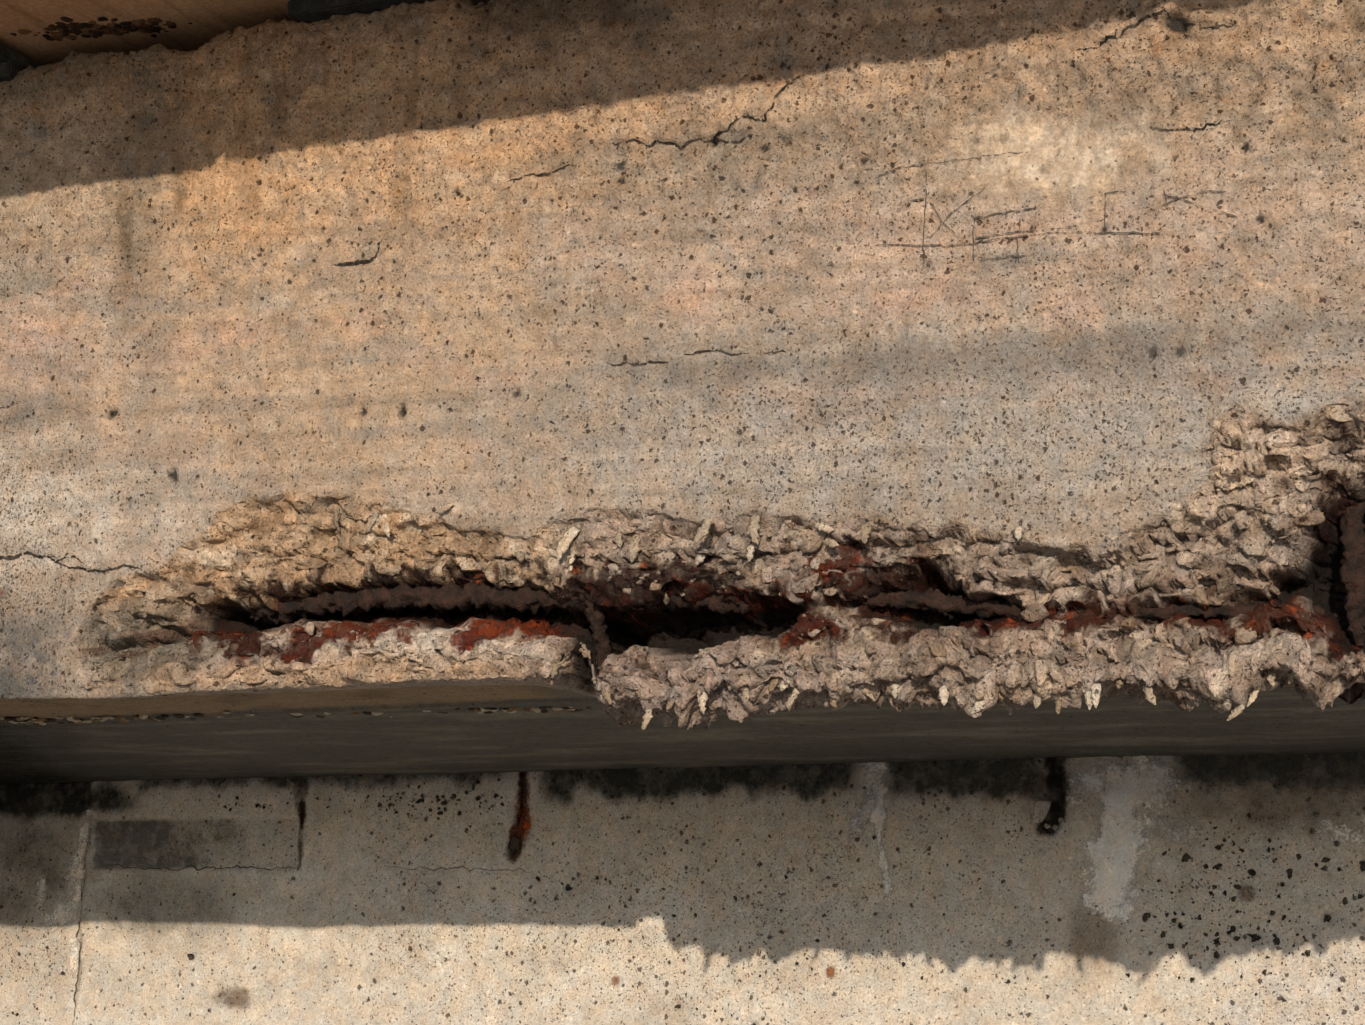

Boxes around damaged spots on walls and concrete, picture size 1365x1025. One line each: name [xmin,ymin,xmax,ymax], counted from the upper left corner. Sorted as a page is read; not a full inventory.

crack [1076,8,1232,50]
crack [612,76,800,150]
crack [507,164,570,182]
crack [334,240,382,266]
crack [606,349,785,367]
crack [0,551,149,575]
spalling [67,391,1365,731]
rust [508,772,531,862]
water stain [541,758,1038,895]
water stain [1067,752,1365,922]